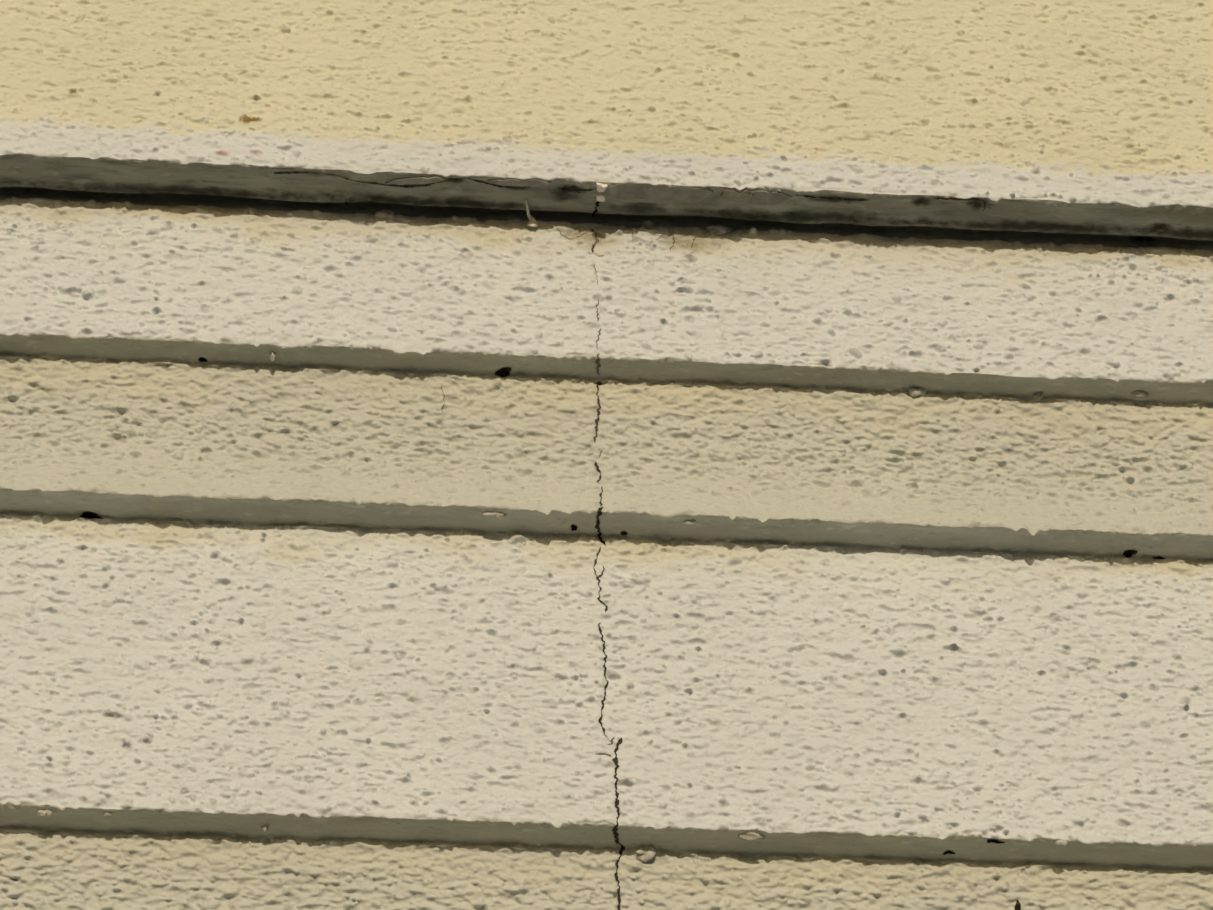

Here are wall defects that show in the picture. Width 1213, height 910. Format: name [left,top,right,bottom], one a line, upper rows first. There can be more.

crack [274,172,510,204]
crack [550,181,625,910]